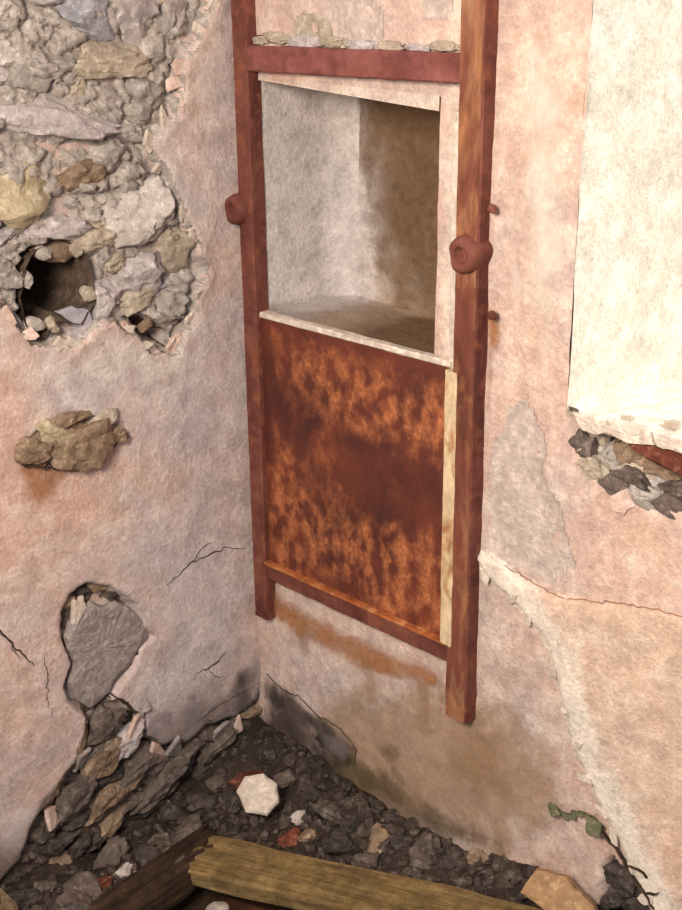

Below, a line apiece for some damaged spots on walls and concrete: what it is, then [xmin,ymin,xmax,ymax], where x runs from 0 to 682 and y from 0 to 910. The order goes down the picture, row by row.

spalling [0,0,220,356]